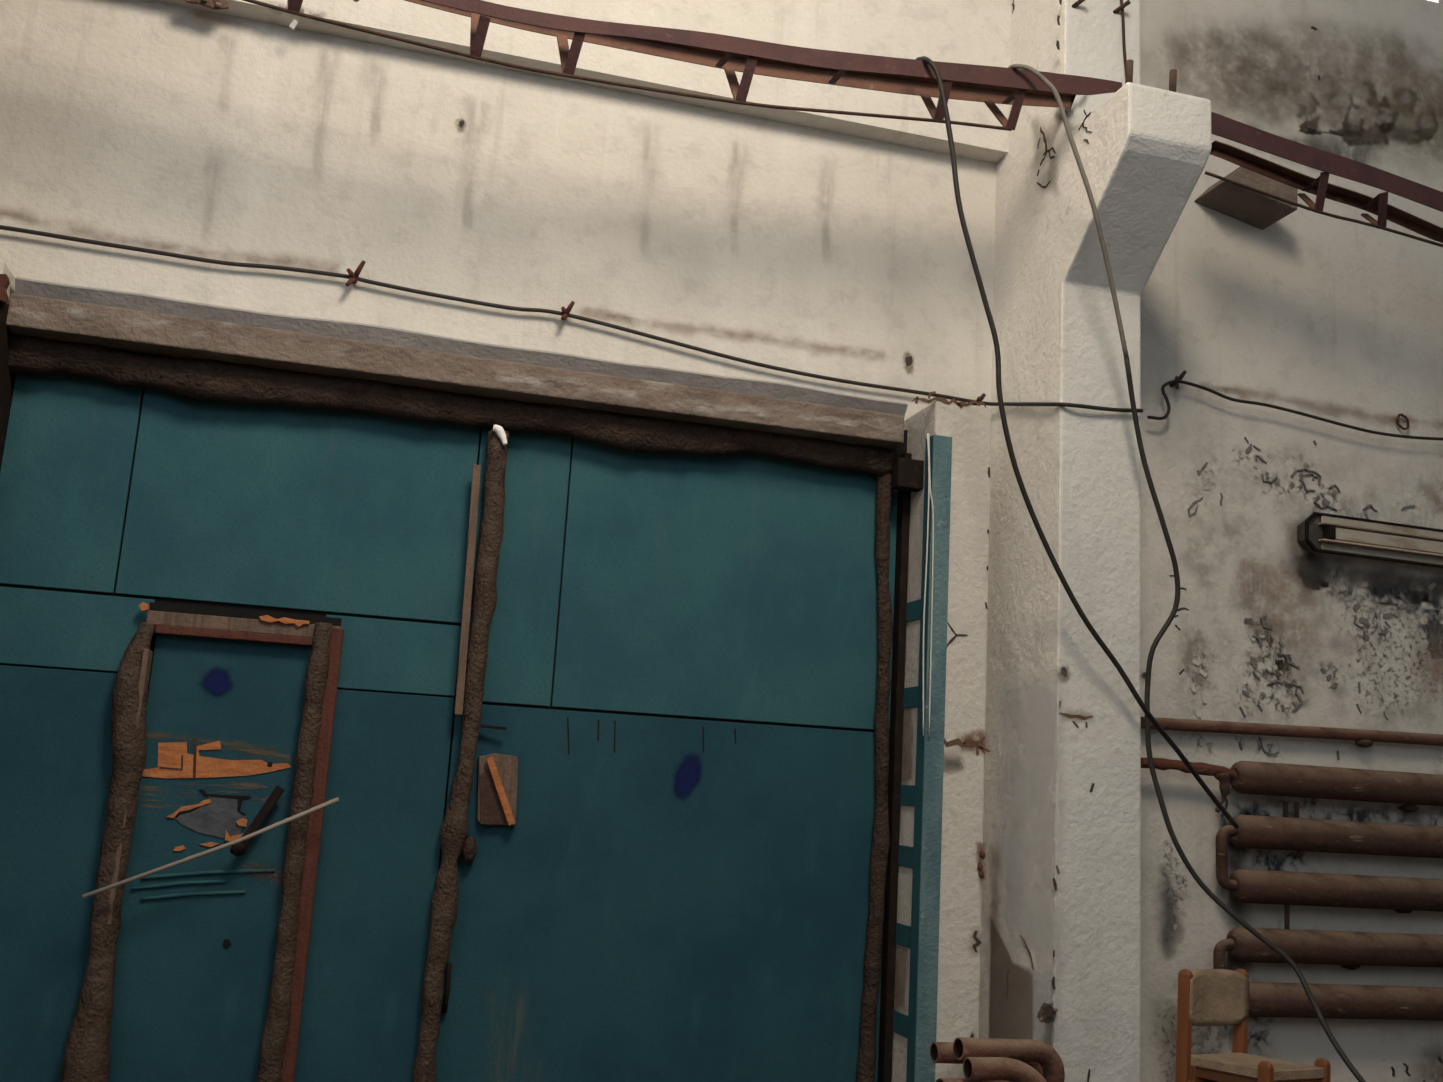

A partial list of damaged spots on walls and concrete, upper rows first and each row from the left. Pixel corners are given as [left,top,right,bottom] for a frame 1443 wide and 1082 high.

leakage [1313,566,1443,720]
spalling [977,844,985,879]
flaking render [970,920,1058,1046]